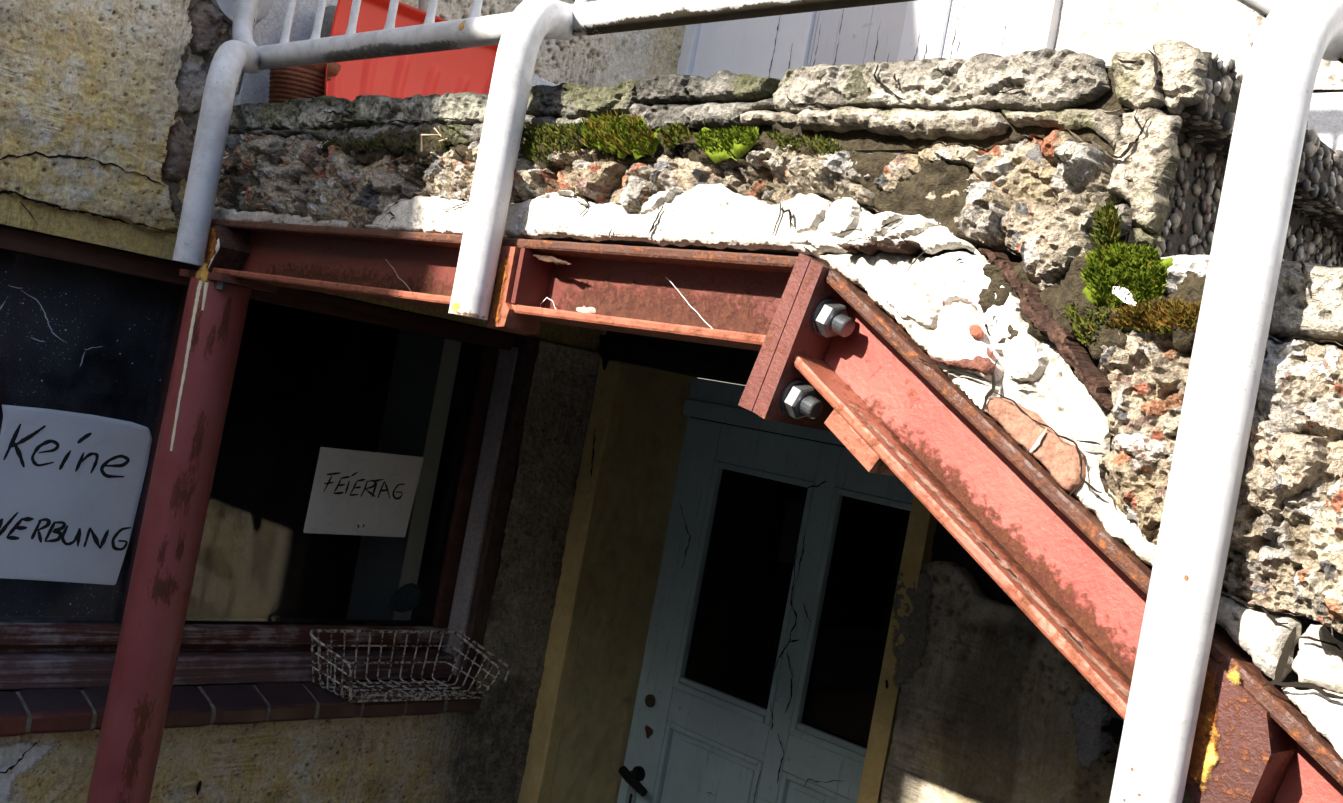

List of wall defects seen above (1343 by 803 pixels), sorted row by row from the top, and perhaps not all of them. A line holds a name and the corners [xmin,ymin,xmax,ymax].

crack [0,151,175,233]
rust [188,298,232,359]
rust [267,251,507,322]
rust [557,278,775,335]
crack [918,356,1102,498]
rust [140,411,208,608]
crack [754,535,837,798]
peeling [885,571,932,690]
peeling [1072,690,1117,769]
rust [1188,667,1239,785]
crack [1262,608,1341,650]
crack [1263,680,1343,700]